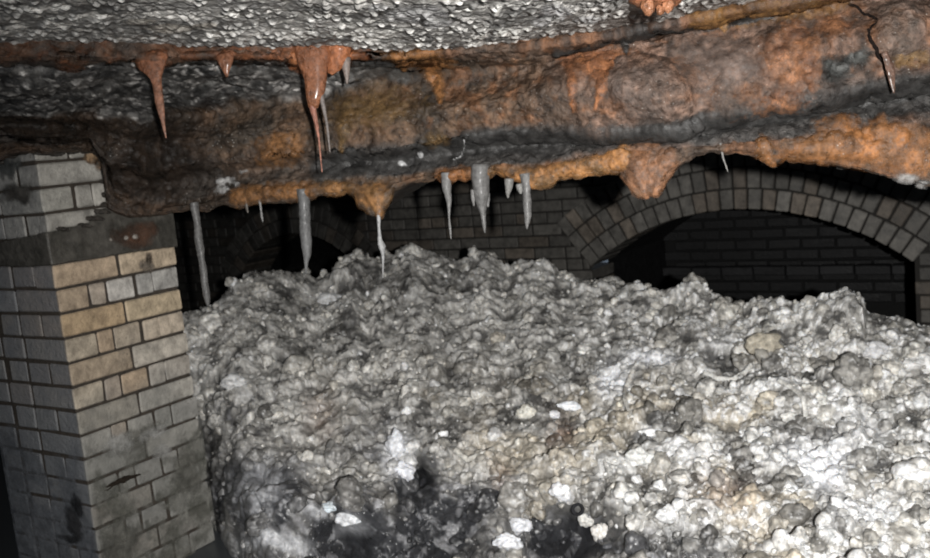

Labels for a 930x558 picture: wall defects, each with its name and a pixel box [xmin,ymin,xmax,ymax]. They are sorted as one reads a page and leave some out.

rust [169,46,302,74]
rust [391,49,453,104]
rust [561,50,626,113]
rust [691,0,858,110]
crack [847,2,892,92]
rust [260,133,302,165]
rust [230,181,393,219]
rust [438,166,471,182]
rust [487,142,676,200]
rust [756,114,930,176]
water stain [0,425,215,558]
crack [105,474,141,491]